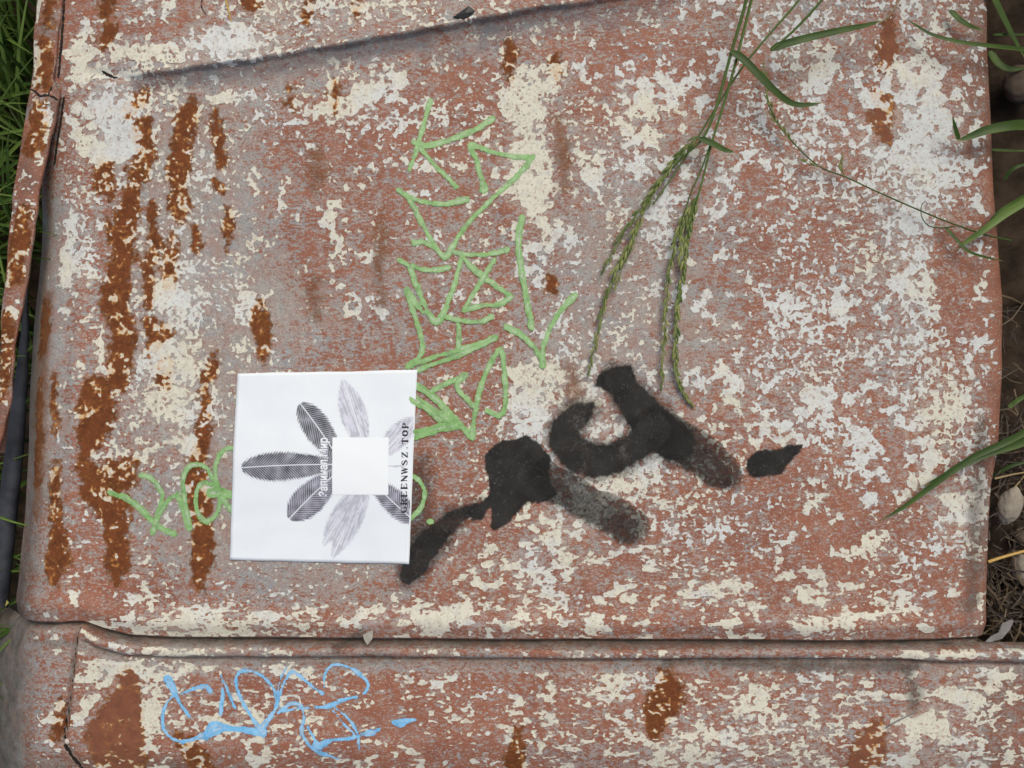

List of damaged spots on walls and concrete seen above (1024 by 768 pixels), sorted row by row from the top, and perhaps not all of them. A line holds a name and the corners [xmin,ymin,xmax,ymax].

rust [21,0,57,158]
peeling [31,40,54,166]
rust [866,88,896,147]
peeling [10,169,39,233]
peeling [4,299,20,320]
peeling [5,249,29,288]
rust [33,85,236,593]
rust [249,299,273,362]
peeling [46,0,1000,657]
rust [83,669,151,768]
peeling [37,630,1024,768]
rust [642,668,687,742]